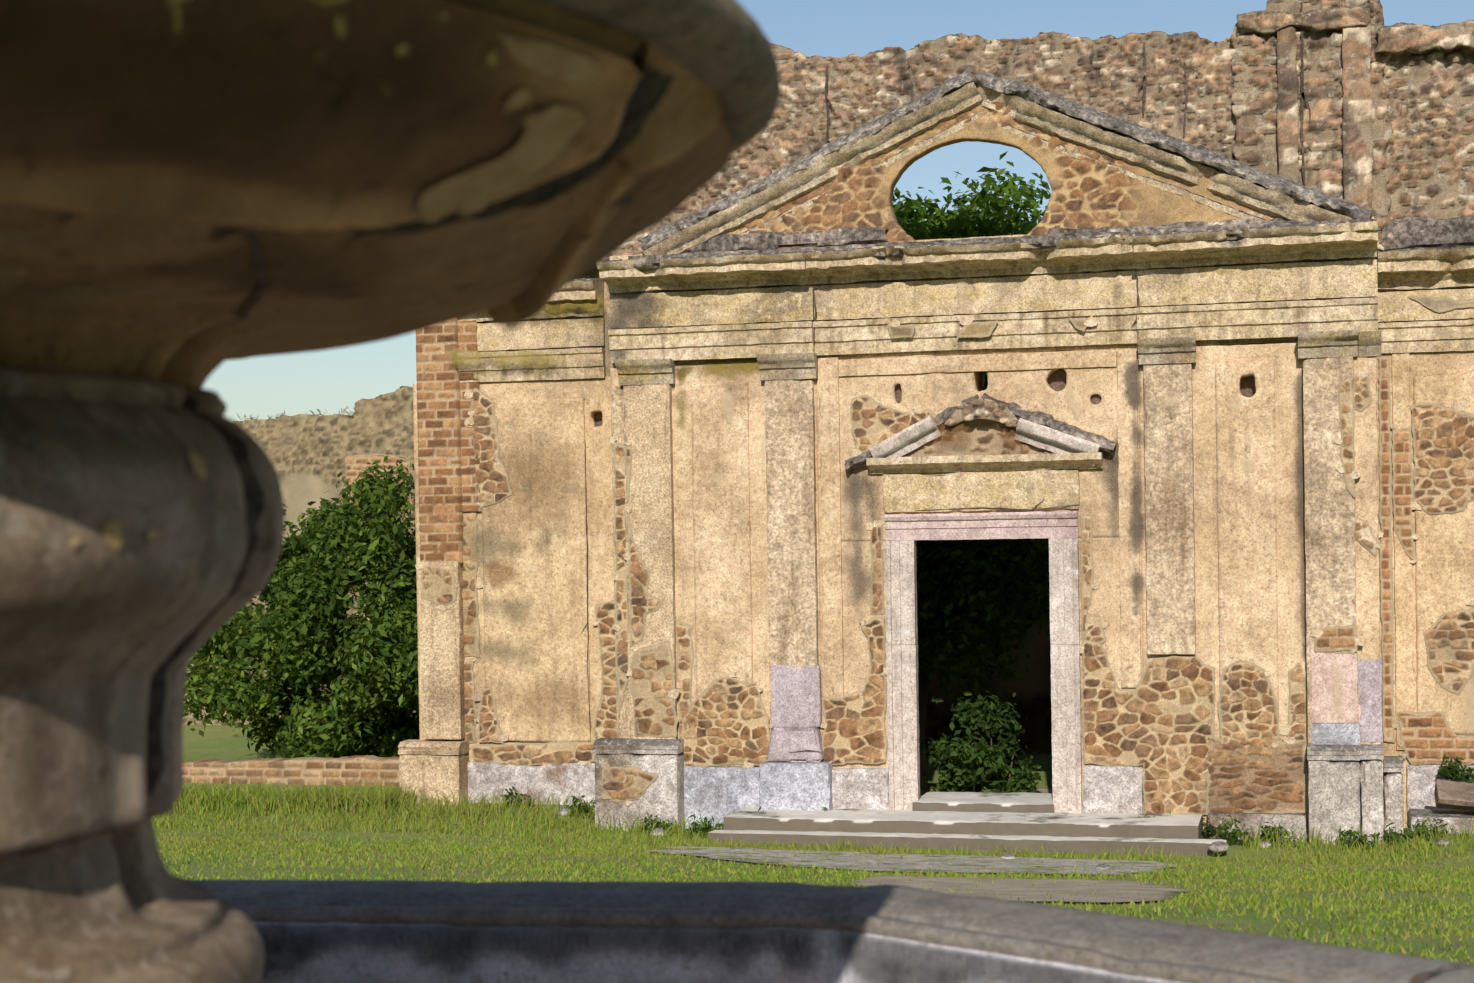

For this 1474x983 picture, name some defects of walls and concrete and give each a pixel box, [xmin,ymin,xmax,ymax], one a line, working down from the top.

peeling [499,36,605,86]
peeling [418,89,586,223]
water stain [1126,364,1140,408]
flaking render [849,395,937,458]
water stain [1100,449,1117,493]
water stain [1131,476,1144,547]
flaking render [415,388,771,806]
water stain [1133,573,1142,600]
flaking render [1310,356,1474,778]
flaking render [820,520,888,765]
flaking render [1079,514,1308,815]